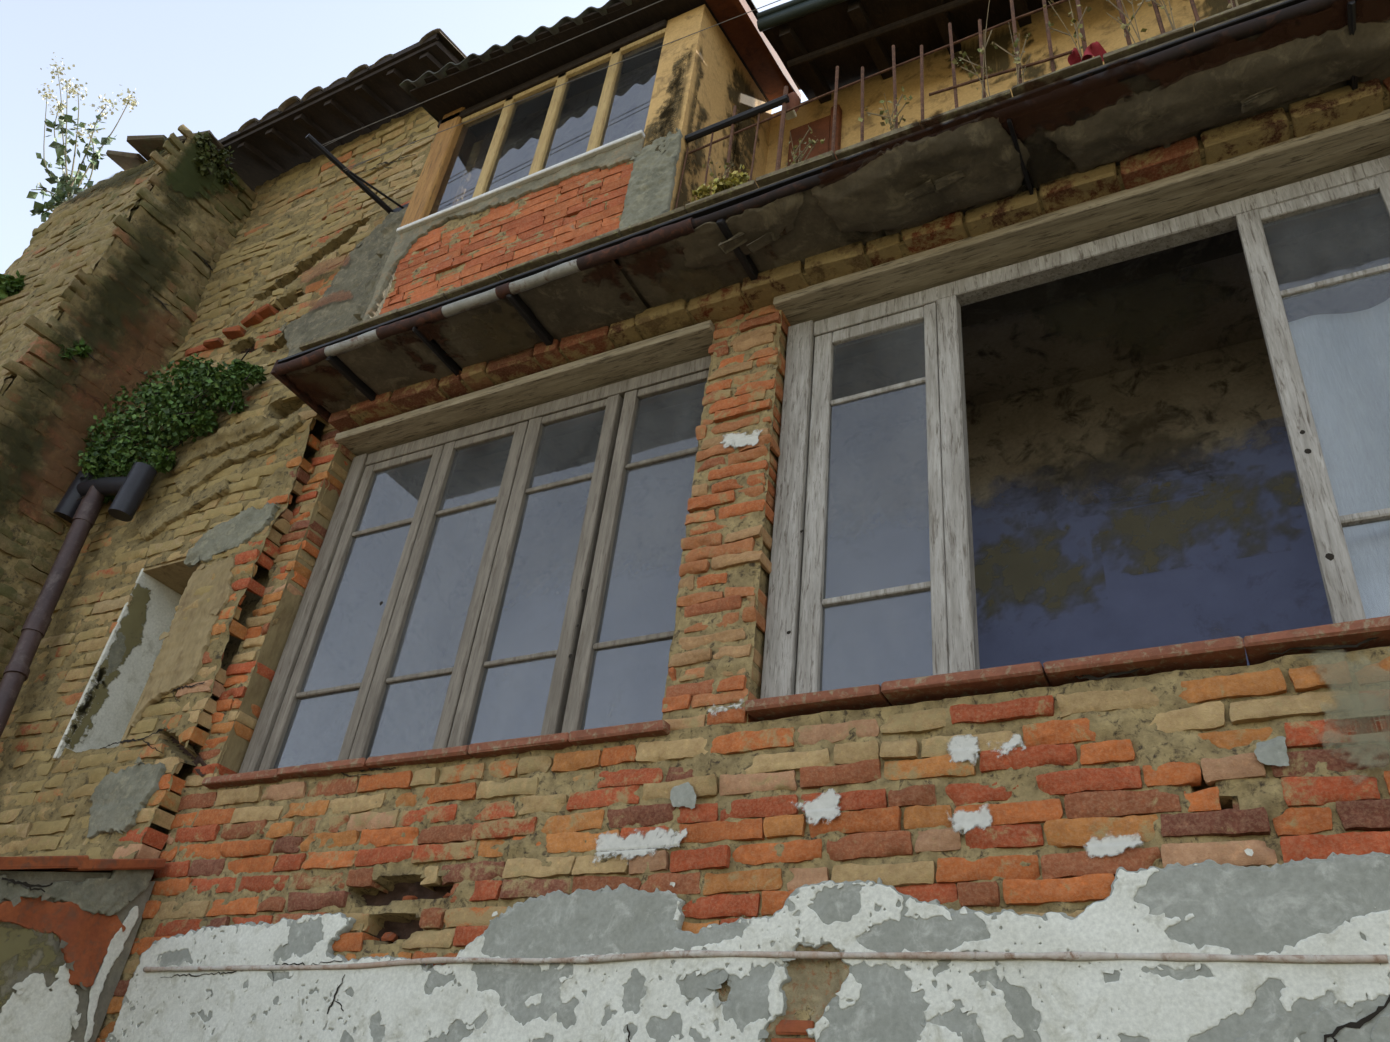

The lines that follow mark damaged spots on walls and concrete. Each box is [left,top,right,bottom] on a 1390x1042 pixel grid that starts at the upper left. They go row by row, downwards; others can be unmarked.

water stain [643,48,708,210]
water stain [722,68,763,181]
water stain [0,189,200,514]
crack [100,682,204,753]
spalling [361,882,453,943]
peeling [1134,848,1390,980]
peeling [267,917,324,1005]
peeling [369,1011,399,1042]
peeling [424,882,990,1042]
peeling [950,963,1042,1042]
peeling [1188,978,1390,1042]
crack [1324,995,1390,1042]